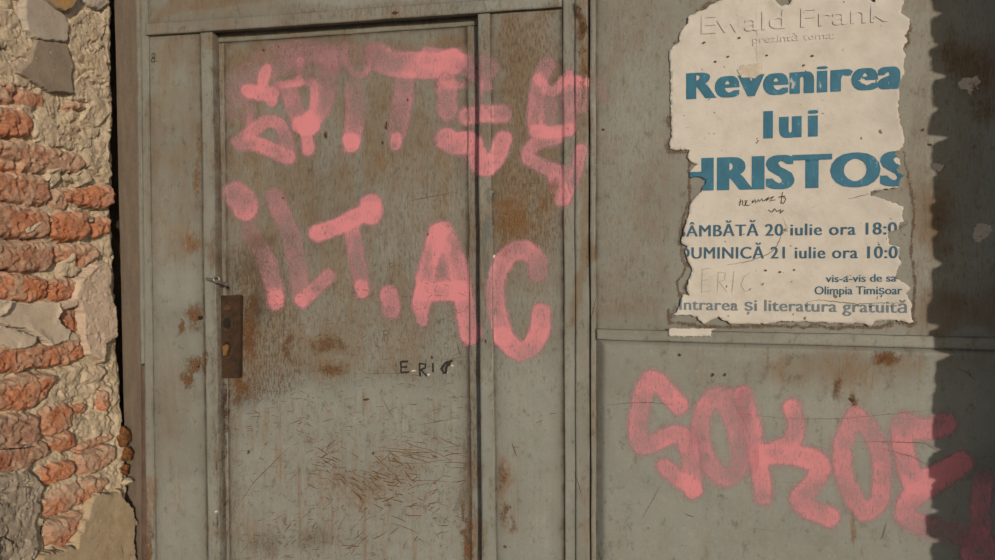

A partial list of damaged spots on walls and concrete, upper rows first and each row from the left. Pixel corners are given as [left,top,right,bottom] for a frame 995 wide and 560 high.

peeling [44,0,78,12]
peeling [0,263,118,407]
corrosion [180,349,207,388]
spalling [69,411,114,439]
peeling [34,488,138,560]